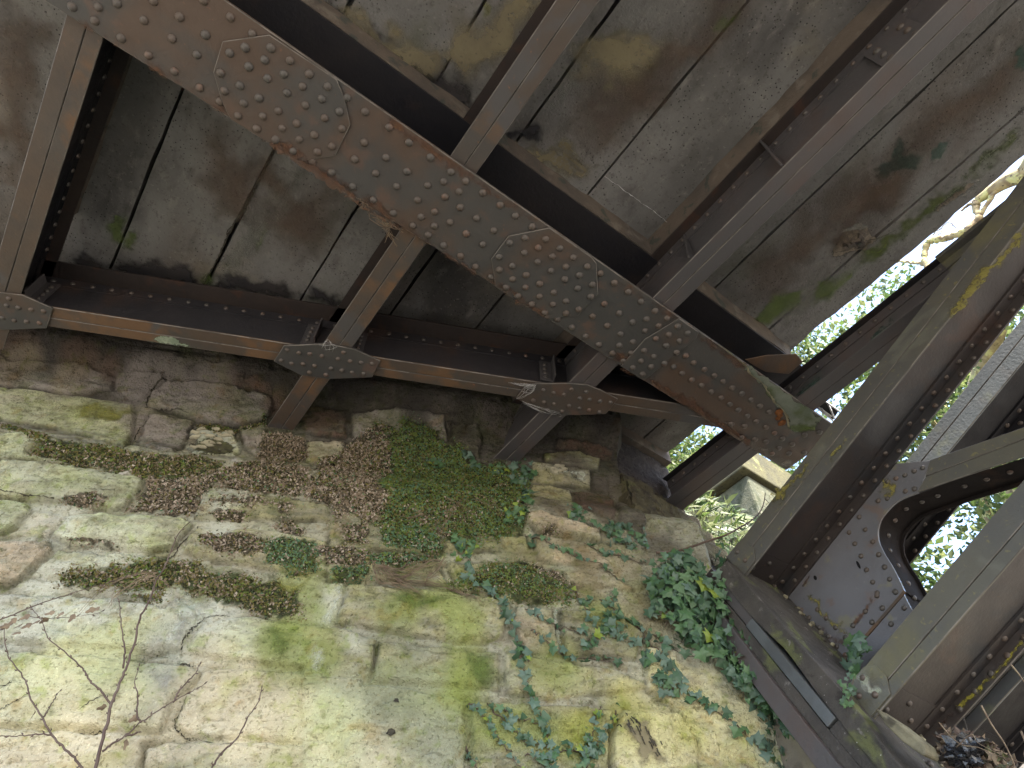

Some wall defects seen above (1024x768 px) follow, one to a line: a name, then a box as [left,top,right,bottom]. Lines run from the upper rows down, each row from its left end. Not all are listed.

leakage [576,34,672,144]
crack [130,377,182,445]
peeling [719,345,822,433]